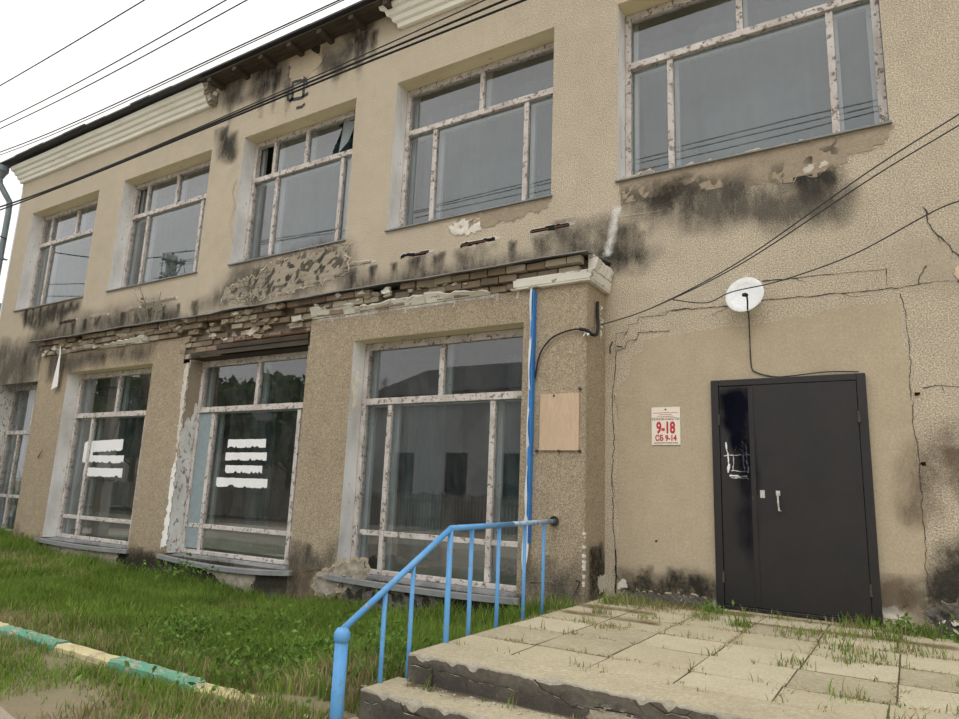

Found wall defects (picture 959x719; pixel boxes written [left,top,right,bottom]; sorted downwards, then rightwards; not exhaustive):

water stain [224,65,291,105]
water stain [221,127,235,160]
spalling [617,124,896,206]
spalling [448,196,553,248]
spalling [529,222,576,235]
water stain [556,208,644,265]
water stain [627,170,849,222]
crack [922,206,959,257]
water stain [392,253,496,280]
flaking render [39,241,584,562]
crack [761,266,959,584]
spalling [205,569,258,595]